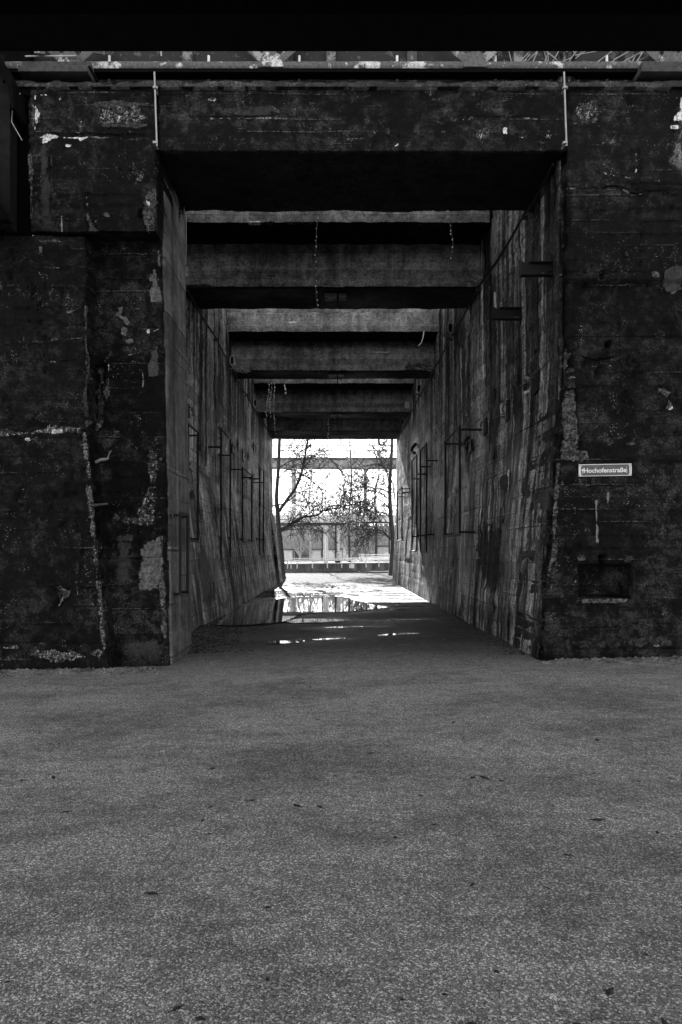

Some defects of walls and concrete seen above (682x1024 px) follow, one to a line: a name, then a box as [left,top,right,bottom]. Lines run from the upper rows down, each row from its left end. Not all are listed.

spalling [547,348,579,576]
spalling [159,562,167,638]